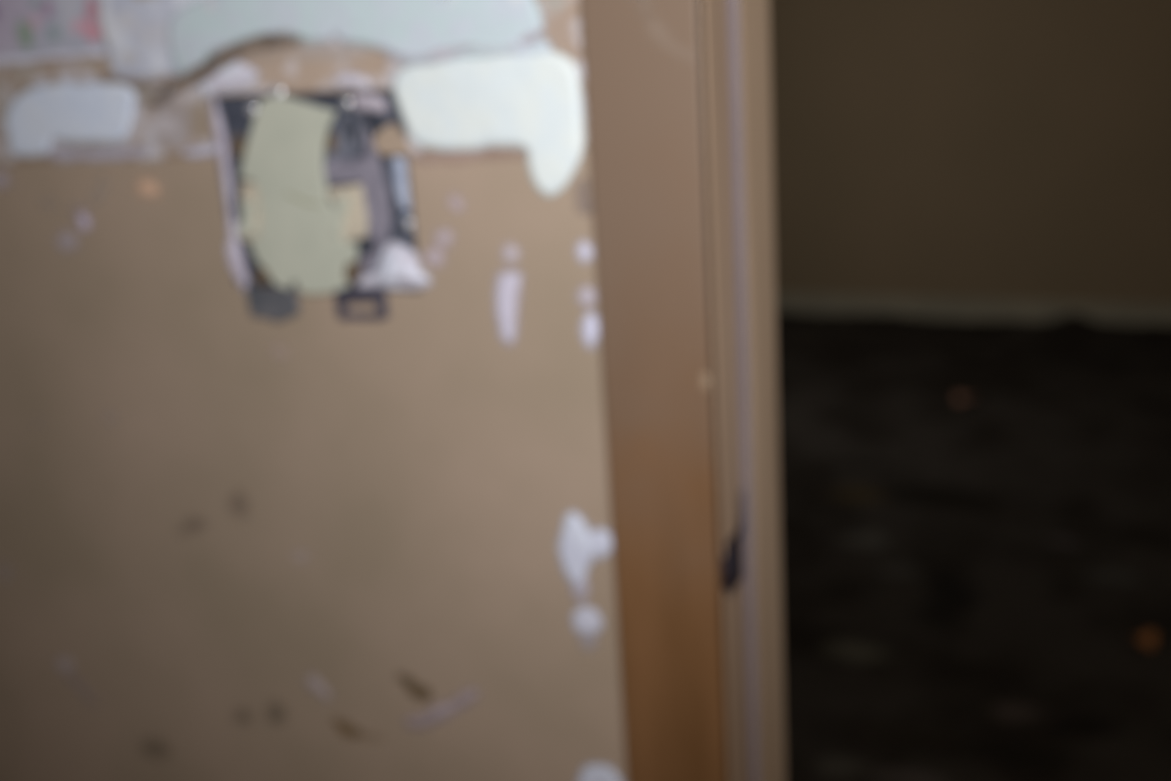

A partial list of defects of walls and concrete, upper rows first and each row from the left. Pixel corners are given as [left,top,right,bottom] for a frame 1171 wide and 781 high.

peeling [0,36,428,164]
peeling [534,0,589,148]